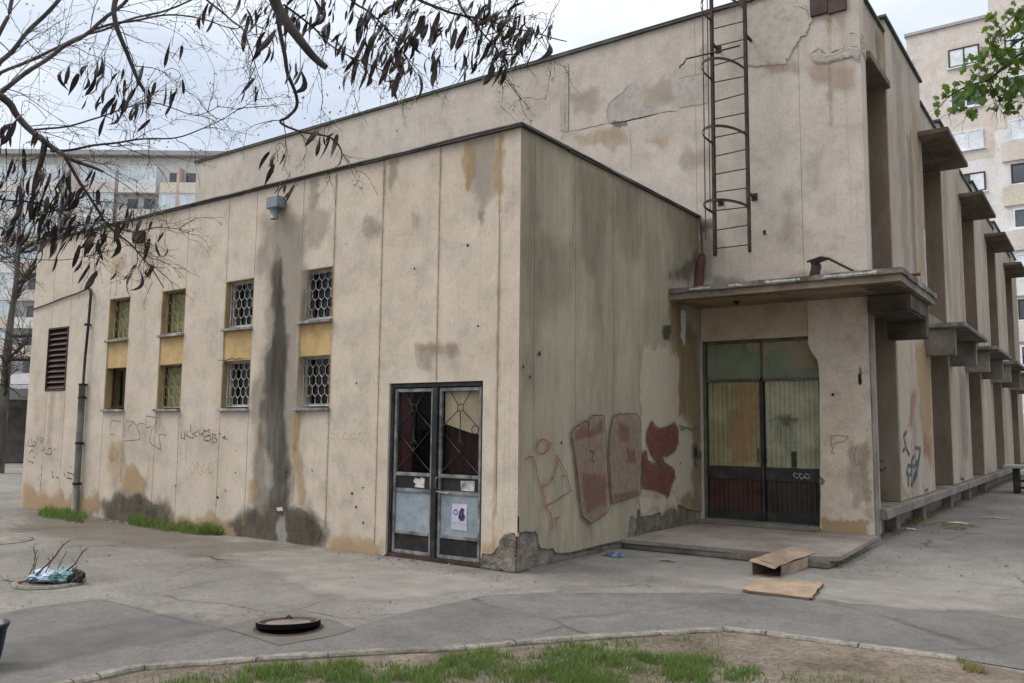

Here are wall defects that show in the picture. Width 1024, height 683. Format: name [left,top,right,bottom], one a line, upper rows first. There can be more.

spalling [747,1,812,67]
spalling [606,83,659,127]
damp [228,222,326,547]
peeling [634,325,702,536]
damp [101,492,170,525]
spalling [480,531,623,573]